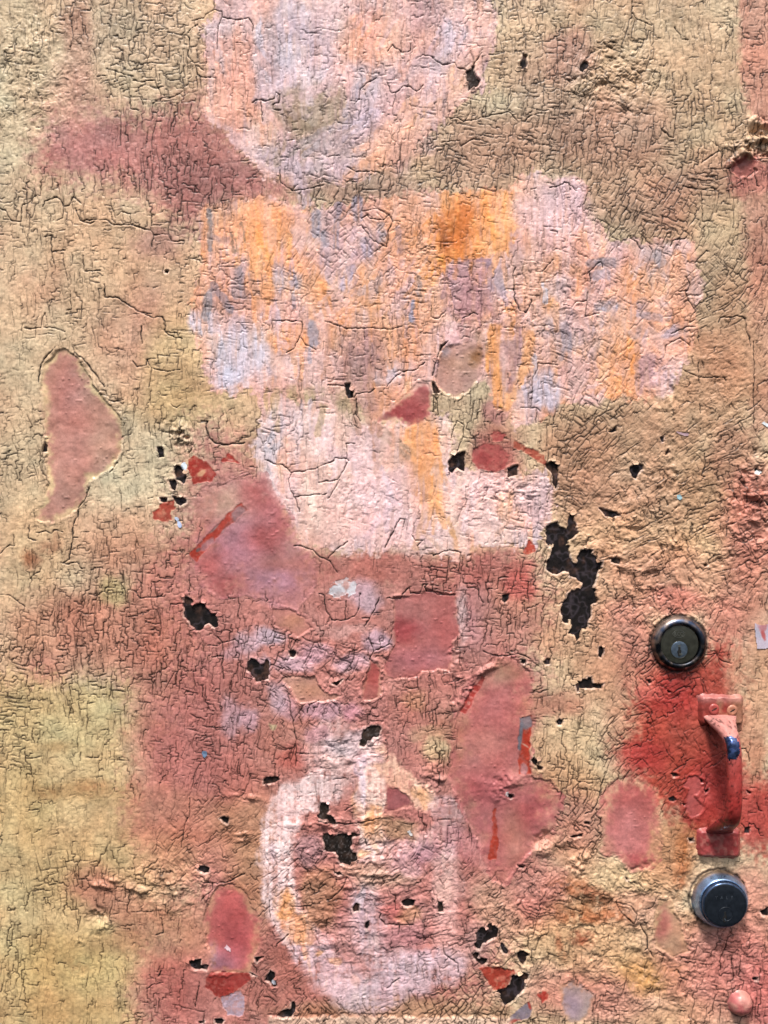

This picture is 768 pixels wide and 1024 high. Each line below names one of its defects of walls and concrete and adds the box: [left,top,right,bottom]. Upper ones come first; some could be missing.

crack [112,2,253,110]
crack [632,126,757,252]
crack [3,183,182,385]
crack [673,278,755,424]
peeling [446,450,465,475]
crack [0,488,90,605]
peeling [153,447,321,657]
crack [324,584,441,657]
peeling [545,510,620,644]
peeling [313,801,360,874]
peeling [185,882,278,992]
peeling [473,922,530,1005]